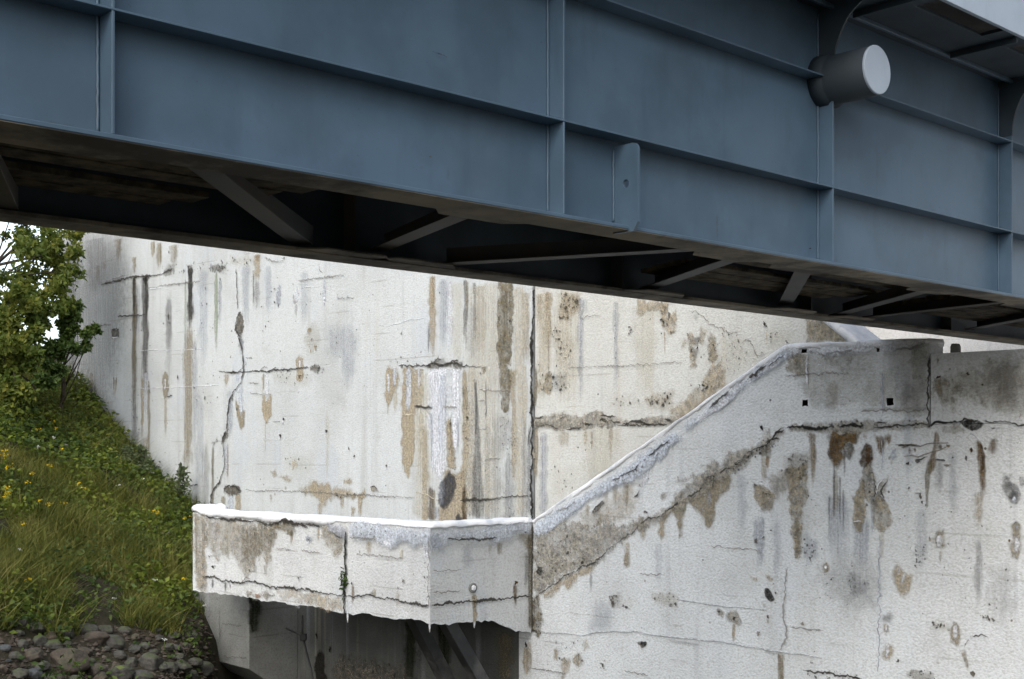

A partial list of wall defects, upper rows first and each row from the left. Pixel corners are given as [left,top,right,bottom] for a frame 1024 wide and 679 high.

damp [131,257,150,446]
damp [496,282,552,471]
damp [205,521,294,571]
damp [385,366,487,521]
crack [188,290,960,629]
spalling [327,319,923,606]
damp [658,476,731,537]
damp [754,464,808,558]
damp [853,479,891,548]
rust [925,433,942,501]
rust [970,433,995,490]